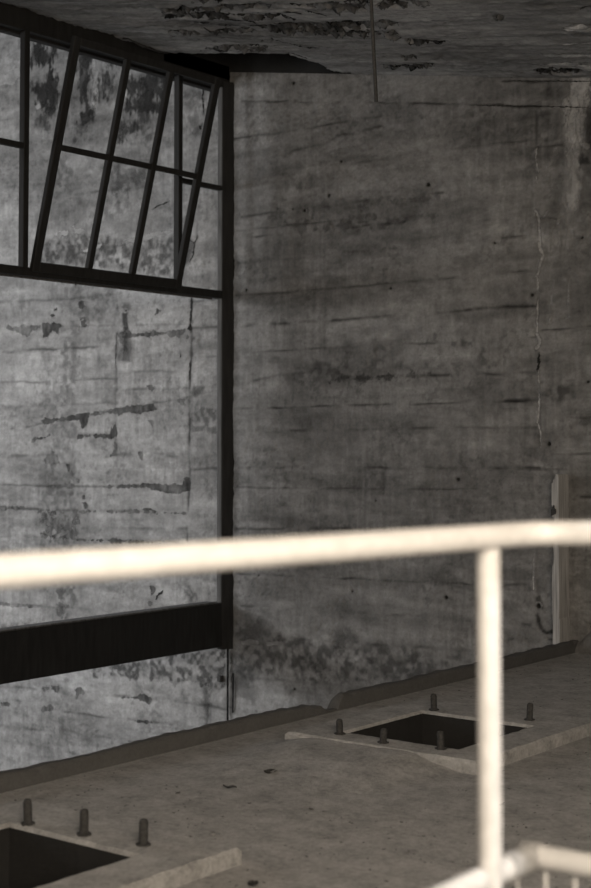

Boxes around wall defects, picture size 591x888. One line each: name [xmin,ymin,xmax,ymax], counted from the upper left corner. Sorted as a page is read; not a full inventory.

spalling [161,0,447,72]
spalling [536,66,580,75]
damp [563,77,591,210]